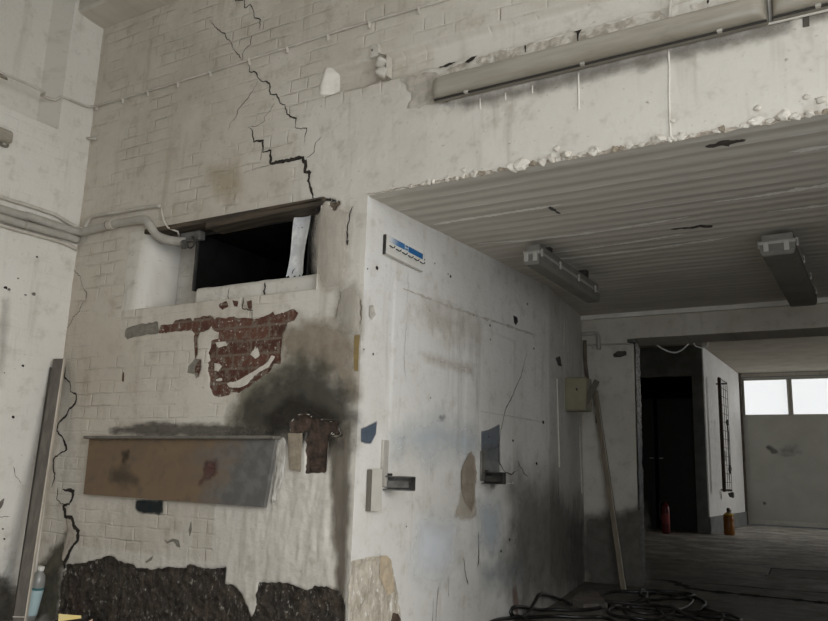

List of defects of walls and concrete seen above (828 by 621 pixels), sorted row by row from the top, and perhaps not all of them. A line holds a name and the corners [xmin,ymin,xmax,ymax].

crack [212,0,316,198]
spalling [400,11,667,109]
peeling [125,300,298,397]
crack [51,373,80,570]
spalling [271,414,339,503]
spalling [57,519,401,621]
crack [652,579,828,604]